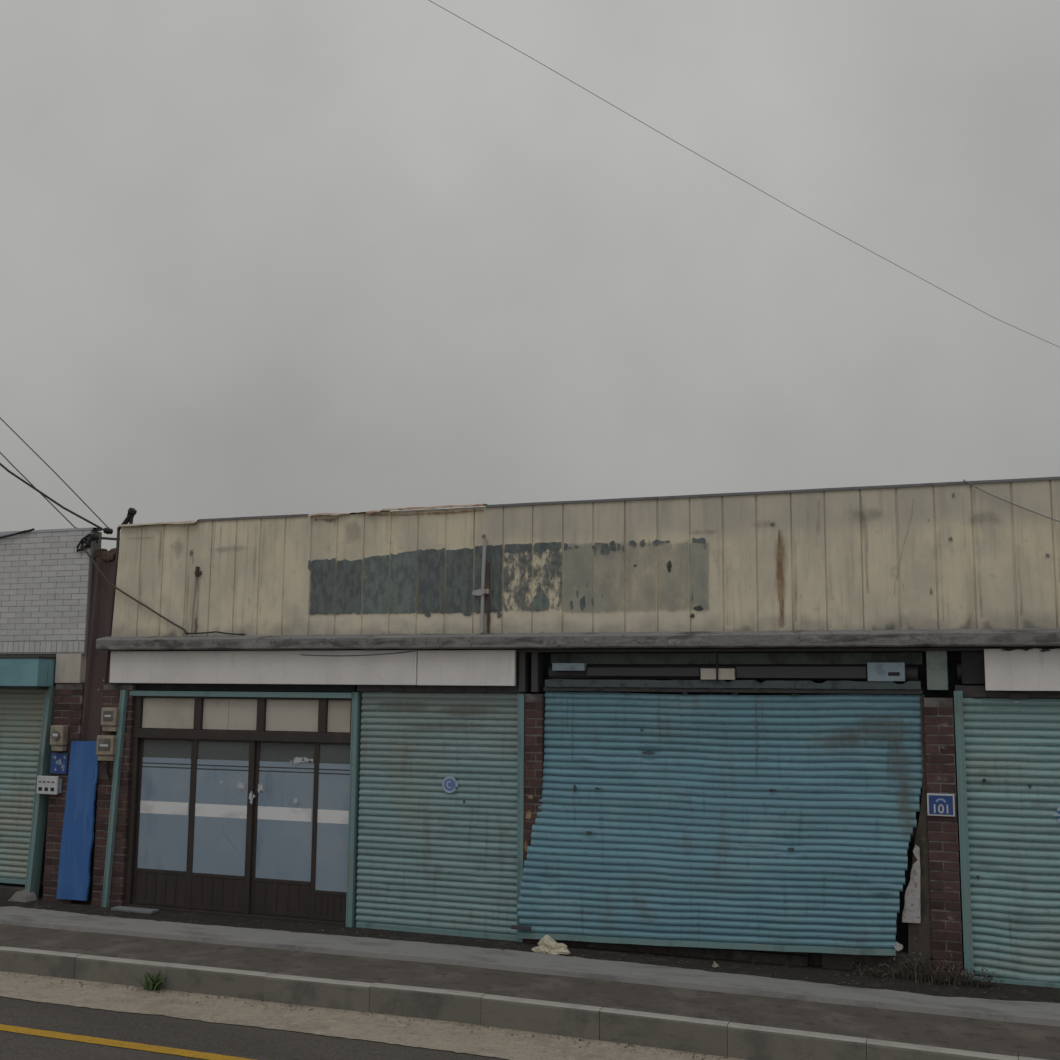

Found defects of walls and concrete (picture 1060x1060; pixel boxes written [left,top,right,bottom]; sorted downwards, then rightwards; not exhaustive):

peeling [308,537,708,618]
corrosion [770,523,783,626]
peeling [902,845,921,923]